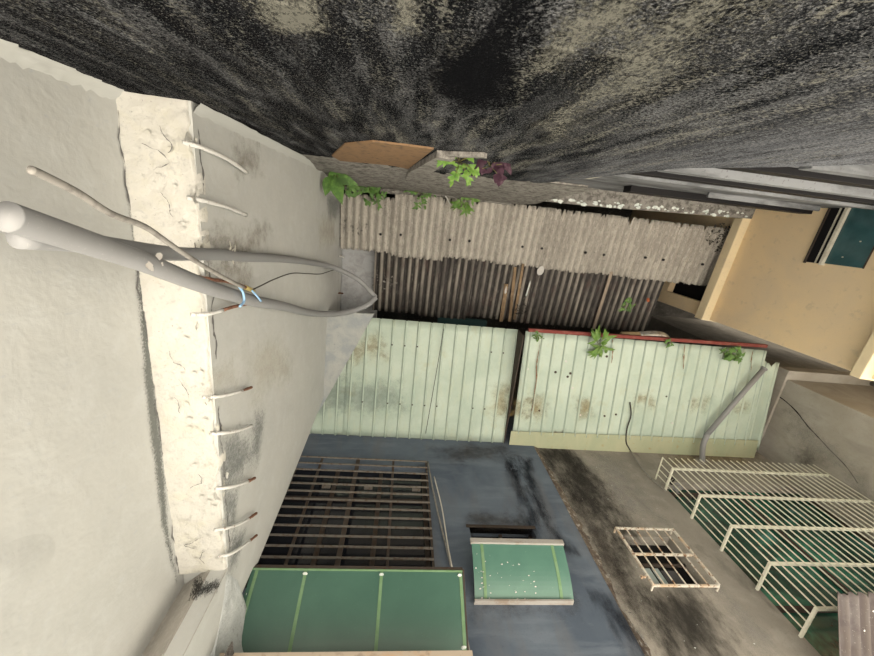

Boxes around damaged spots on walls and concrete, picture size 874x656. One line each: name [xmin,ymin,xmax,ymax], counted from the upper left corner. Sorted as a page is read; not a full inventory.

water stain [401,0,563,117]
spalling [190,304,247,330]
spalling [202,386,253,405]
spalling [209,423,253,437]
spalling [213,472,256,500]
spalling [213,512,258,563]